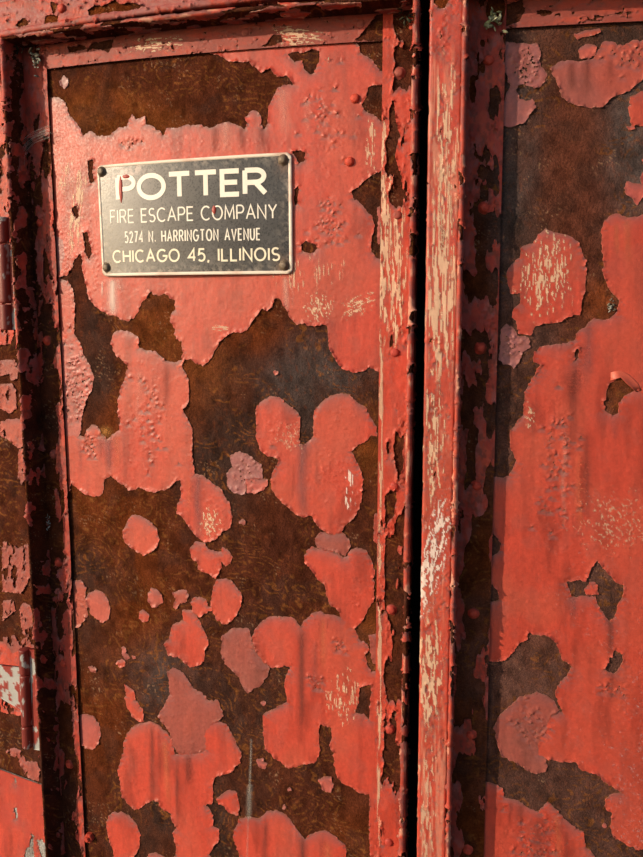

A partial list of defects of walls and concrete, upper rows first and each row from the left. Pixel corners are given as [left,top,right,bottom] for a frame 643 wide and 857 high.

rust [48,53,293,136]
peeling [488,85,501,131]
peeling [459,144,501,308]
rust [494,0,643,478]
rust [0,330,34,653]
peeling [0,0,433,857]
rust [60,254,379,857]
peeling [447,326,501,857]
rust [486,633,643,857]
rust [567,561,624,645]
peeling [605,650,623,673]
peeling [604,378,634,415]